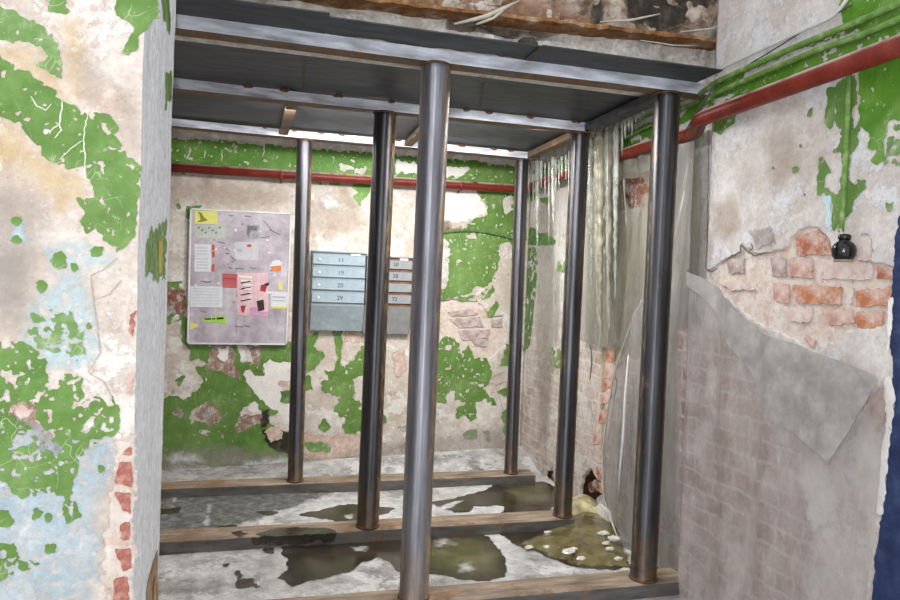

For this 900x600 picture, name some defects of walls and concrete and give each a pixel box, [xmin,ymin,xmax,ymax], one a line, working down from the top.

peeling [114,0,171,55]
spalling [624,0,717,32]
crack [31,96,90,172]
peeling [171,138,297,180]
peeling [0,7,142,600]
peeling [145,219,291,468]
peeling [436,158,515,442]
flaking render [706,58,900,600]
peeling [303,331,365,461]
water stain [160,492,403,590]
water stain [432,478,555,513]
water stain [429,531,631,582]